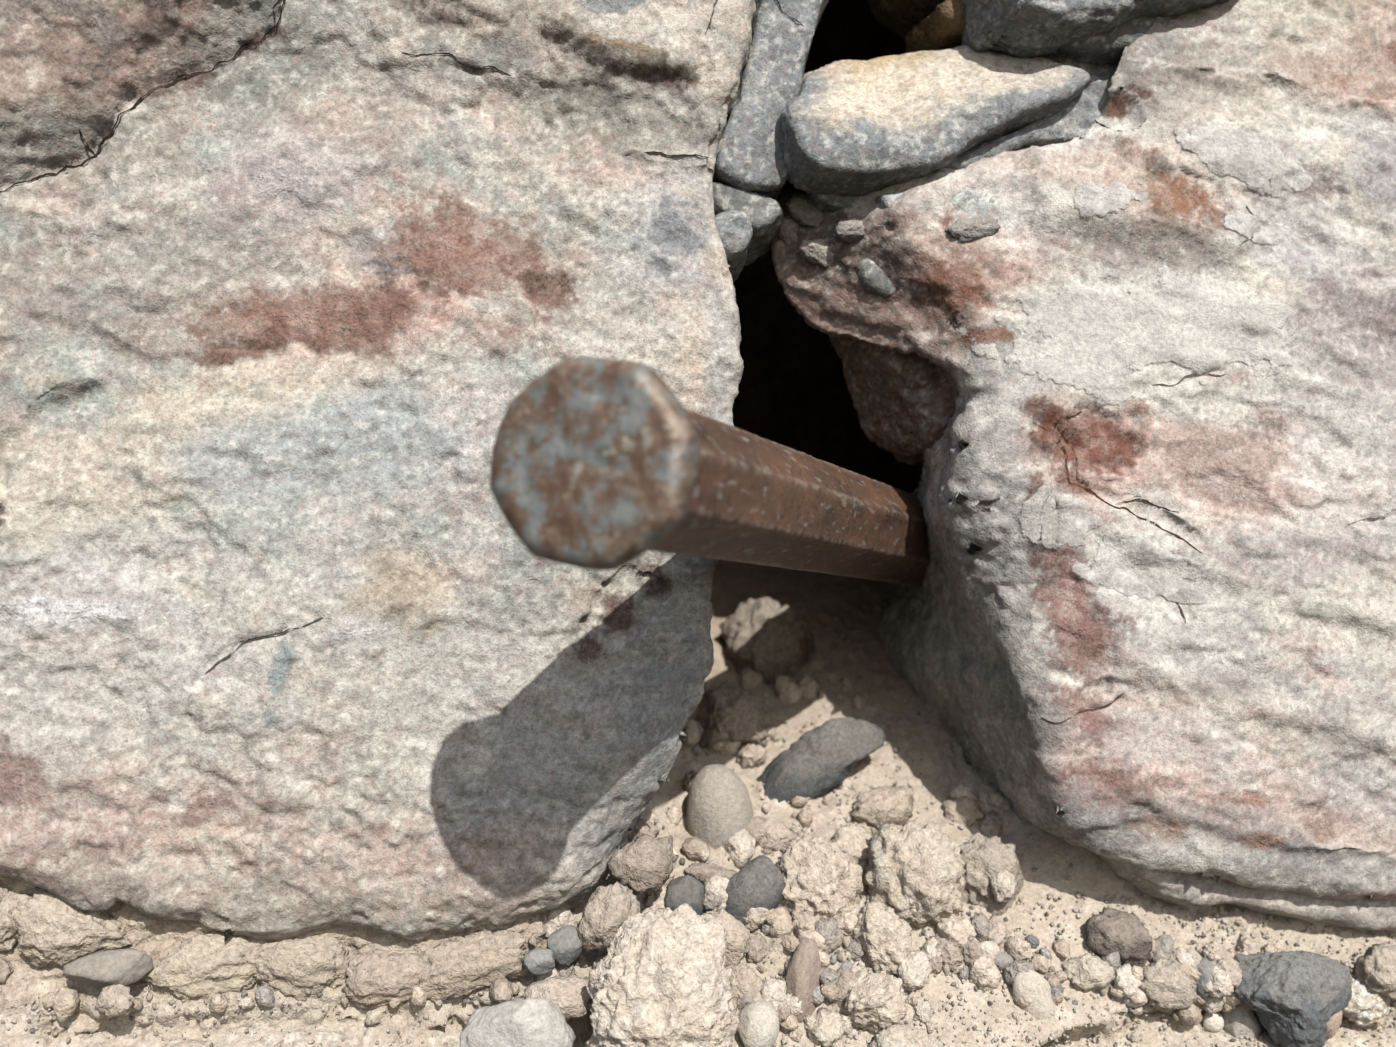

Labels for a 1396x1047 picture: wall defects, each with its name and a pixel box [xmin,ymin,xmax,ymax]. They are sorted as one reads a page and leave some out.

crack [1,0,286,192]
crack [1035,411,1200,552]
crack [205,617,323,674]